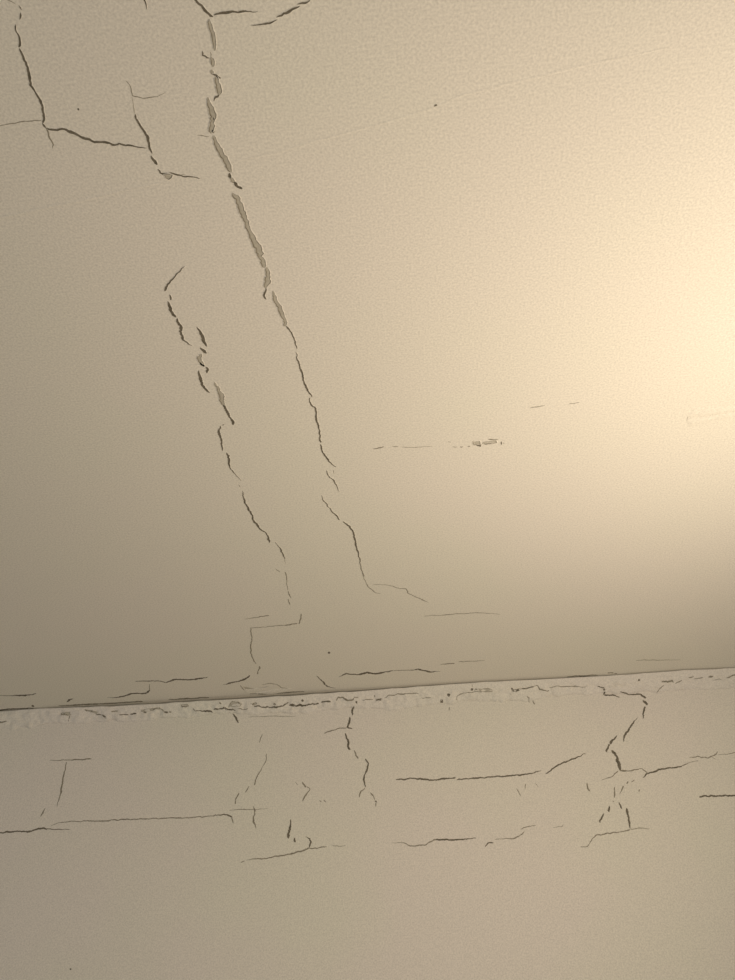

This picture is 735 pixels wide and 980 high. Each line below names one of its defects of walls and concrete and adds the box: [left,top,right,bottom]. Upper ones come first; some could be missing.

crack [0,0,200,179]
crack [241,782,345,863]
crack [194,0,494,616]
crack [0,266,735,847]